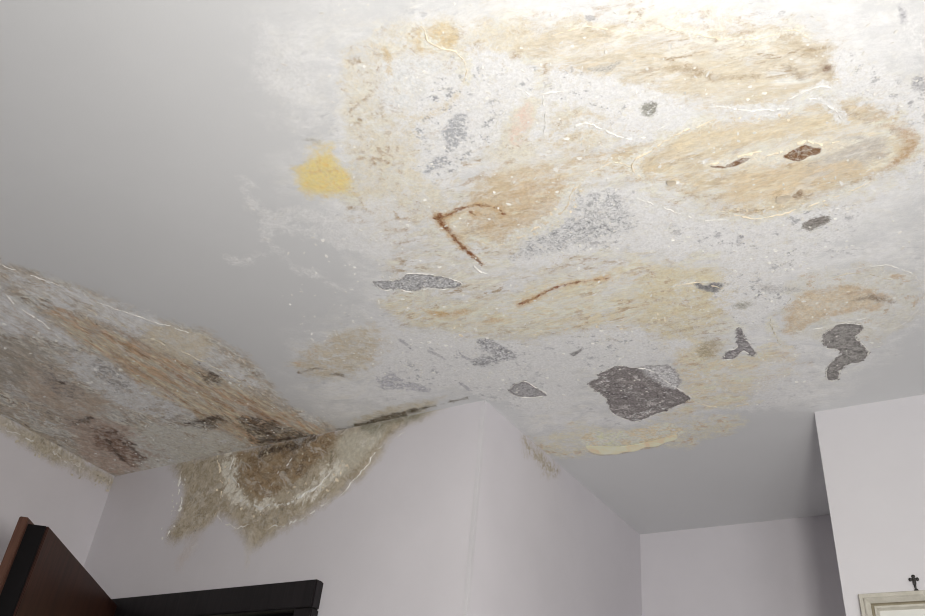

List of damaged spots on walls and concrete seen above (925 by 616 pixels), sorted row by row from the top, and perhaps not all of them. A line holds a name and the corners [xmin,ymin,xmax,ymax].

spalling [372,273,462,293]
spalling [459,338,518,368]
spalling [722,327,757,360]
spalling [821,323,871,382]
spalling [507,380,547,398]
spalling [580,364,692,456]